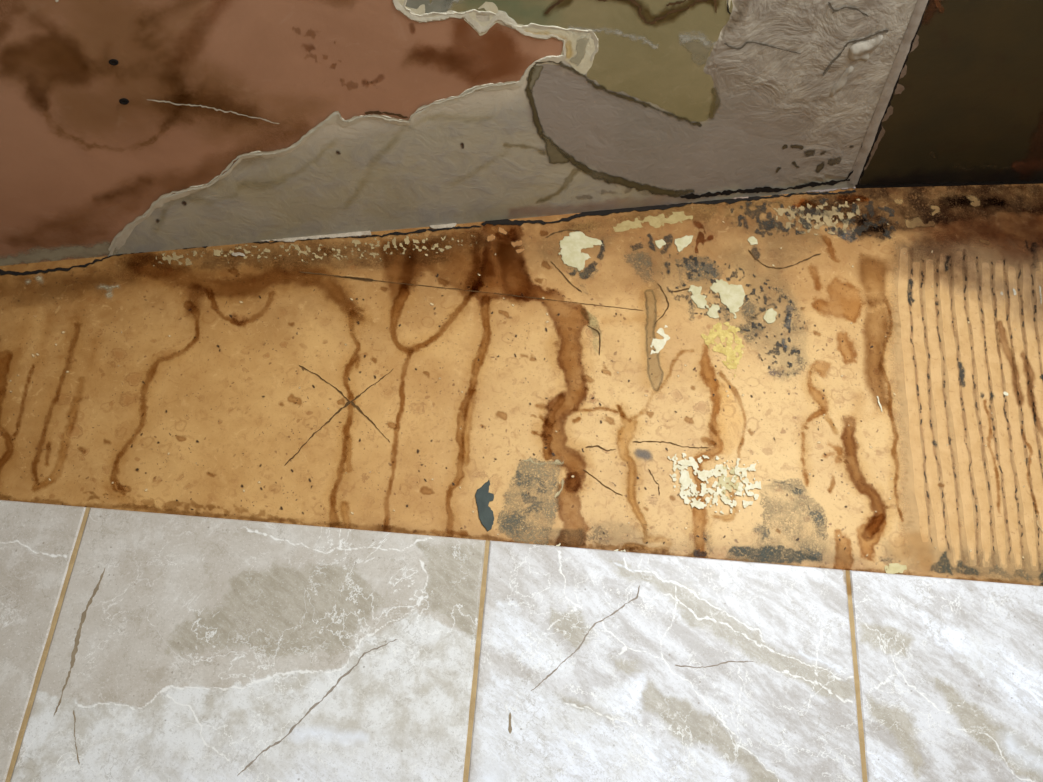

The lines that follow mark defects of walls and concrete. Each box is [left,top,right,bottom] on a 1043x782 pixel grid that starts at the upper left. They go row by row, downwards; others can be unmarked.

crack [0,252,142,276]
peeling [0,0,733,264]
water stain [511,280,552,301]
water stain [569,240,605,279]
crack [301,0,1043,355]
water stain [624,234,805,376]
water stain [776,145,841,173]
water stain [731,198,897,242]
crack [284,365,394,466]
peeling [475,458,563,545]
crack [531,585,640,691]
crack [237,639,397,776]